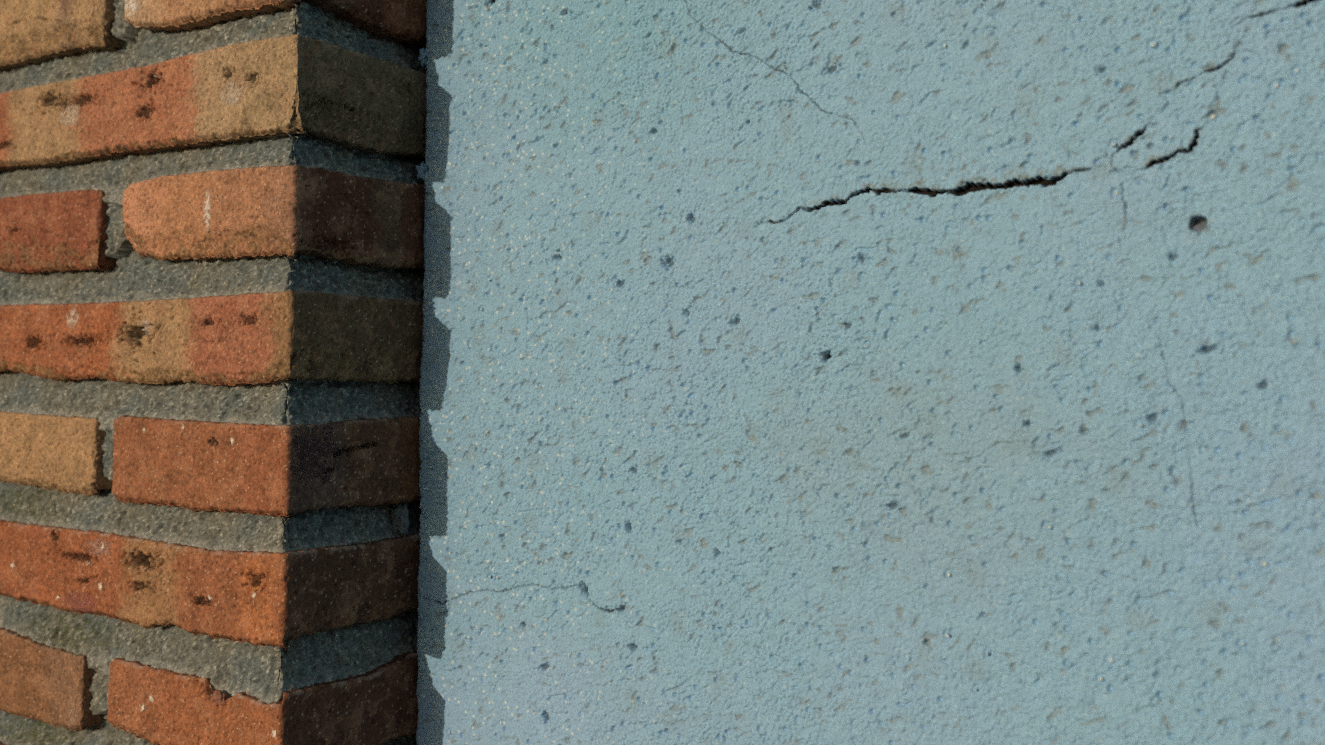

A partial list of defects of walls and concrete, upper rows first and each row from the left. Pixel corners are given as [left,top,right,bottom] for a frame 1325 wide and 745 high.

crack [1253,0,1318,18]
crack [1118,128,1200,169]
crack [771,169,1088,224]